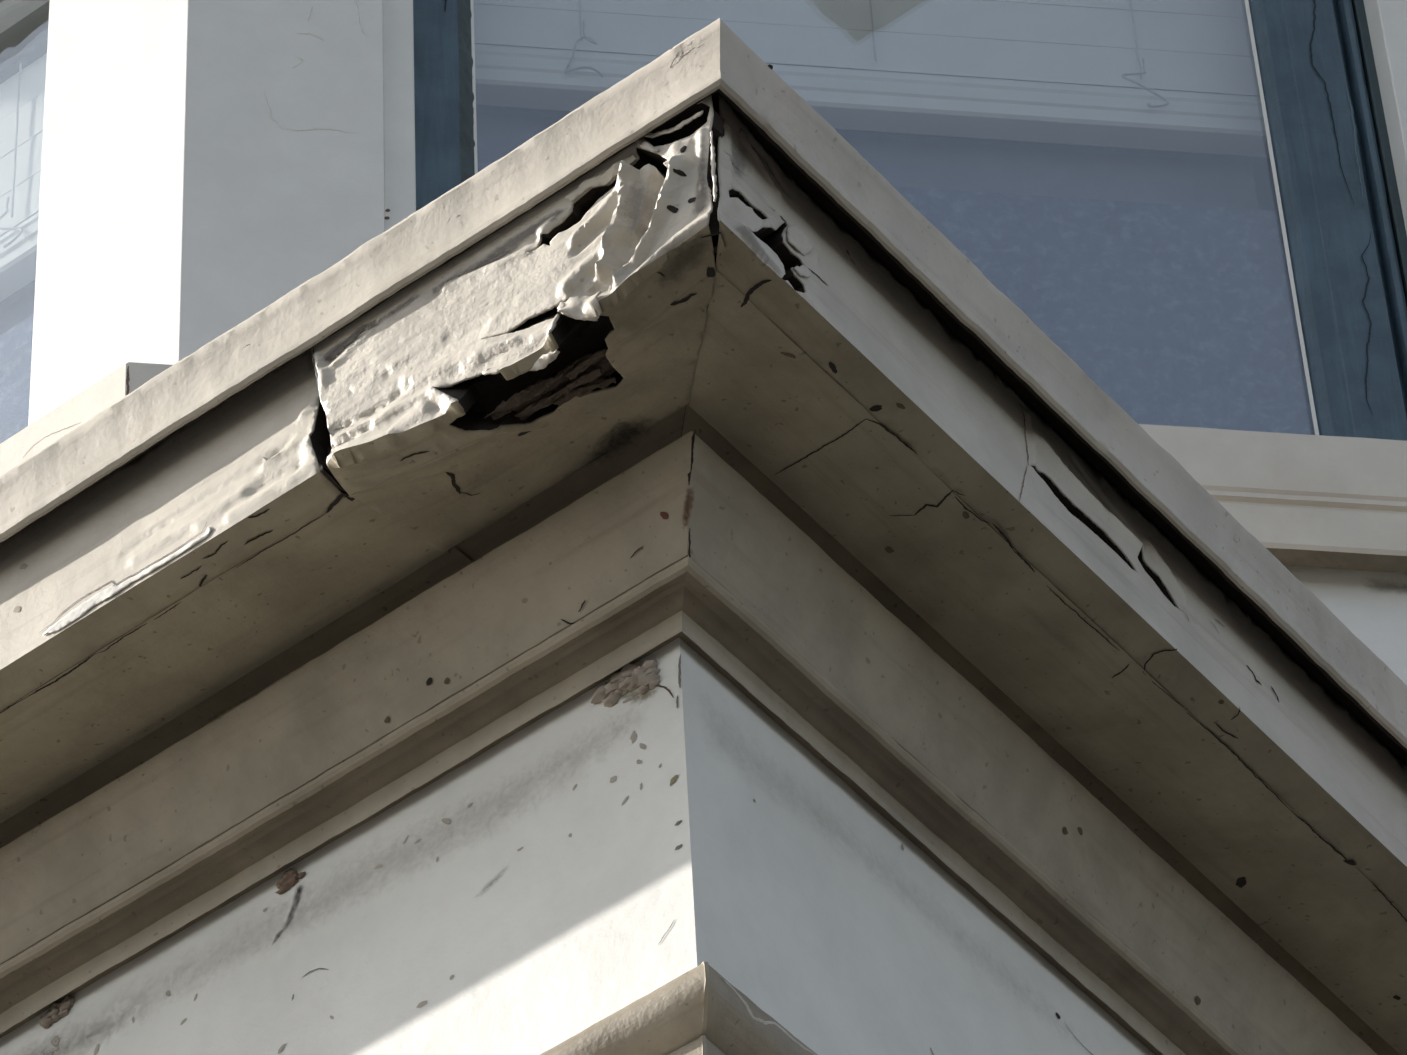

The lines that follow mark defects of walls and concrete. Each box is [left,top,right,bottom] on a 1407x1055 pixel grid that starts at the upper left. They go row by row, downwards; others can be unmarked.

peeling [565,110,704,201]
peeling [787,225,814,277]
peeling [557,291,602,321]
peeling [530,349,560,371]
crack [867,419,917,454]
peeling [43,527,212,636]
crack [0,385,410,713]
crack [889,490,1407,922]